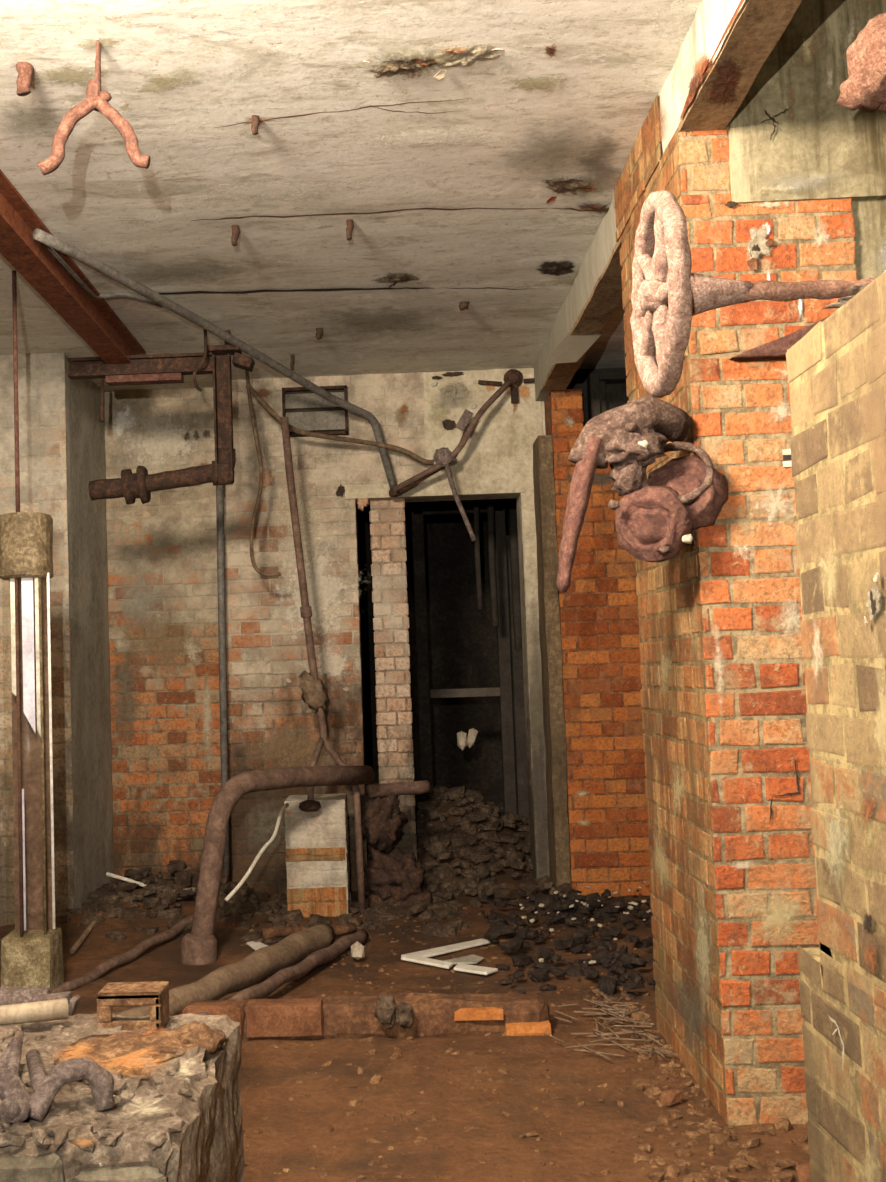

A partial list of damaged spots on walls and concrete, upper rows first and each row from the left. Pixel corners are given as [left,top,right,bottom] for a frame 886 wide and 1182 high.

spalling [363,45,505,80]
corrosion [680,0,744,120]
damp [510,78,567,90]